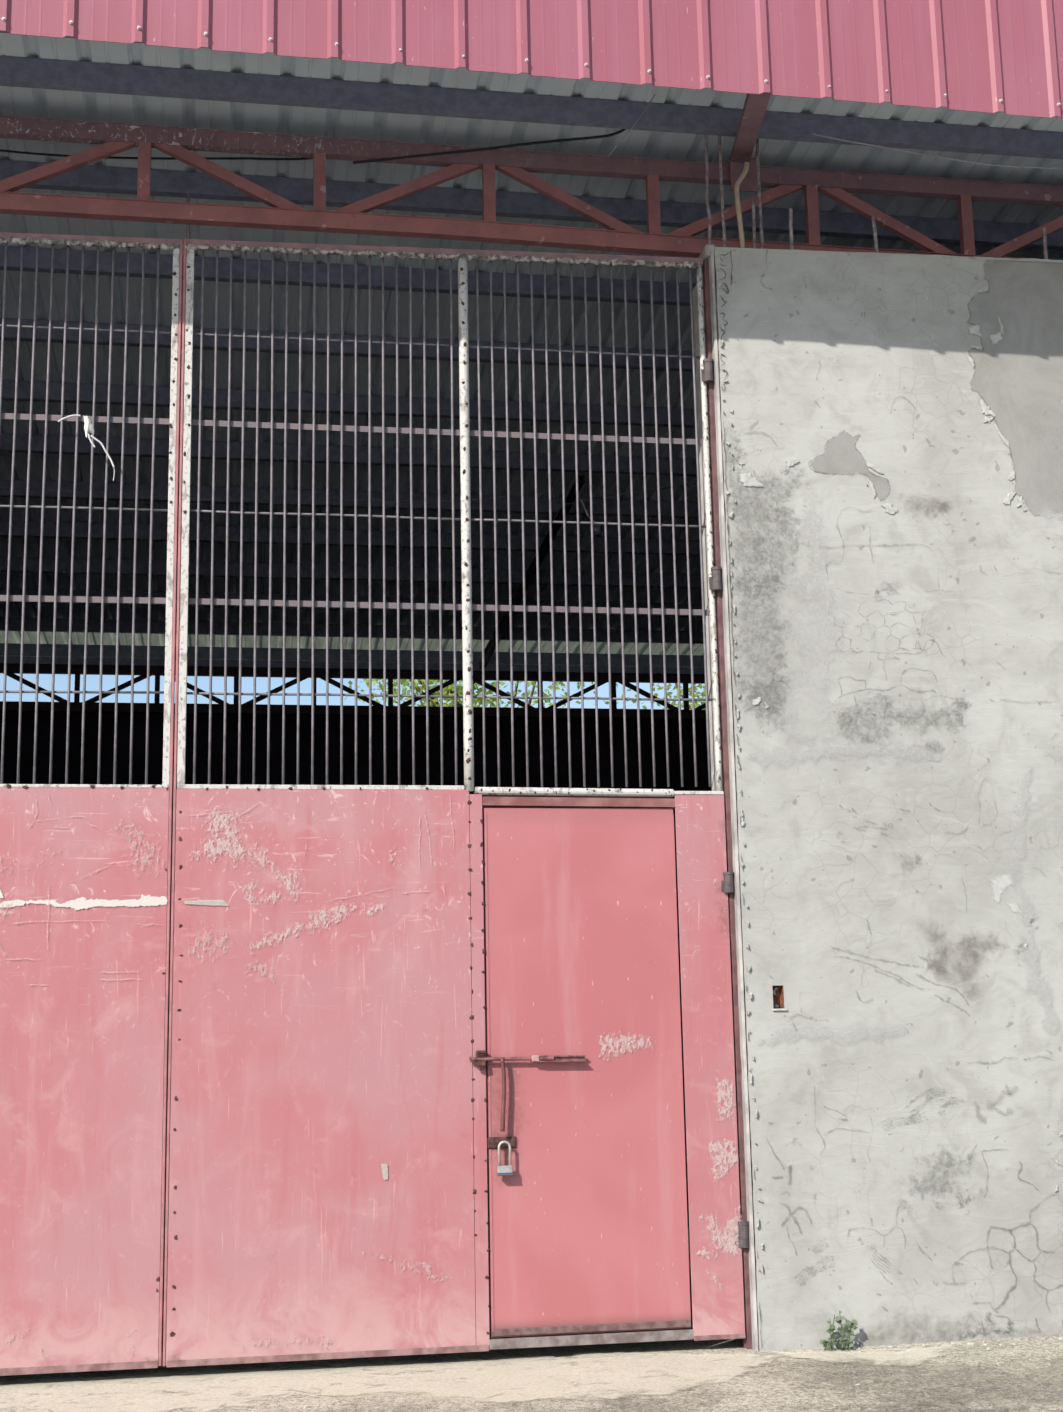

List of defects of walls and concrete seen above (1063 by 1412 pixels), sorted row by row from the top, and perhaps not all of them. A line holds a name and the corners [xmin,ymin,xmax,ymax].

peeling [965,227,1063,517]
spalling [705,135,741,770]
peeling [786,431,898,515]
leakage [733,460,908,739]
peeling [0,890,167,919]
peeling [599,1035,656,1057]
peeling [716,1079,733,1121]
peeling [708,1140,738,1179]
peeling [698,1206,740,1281]